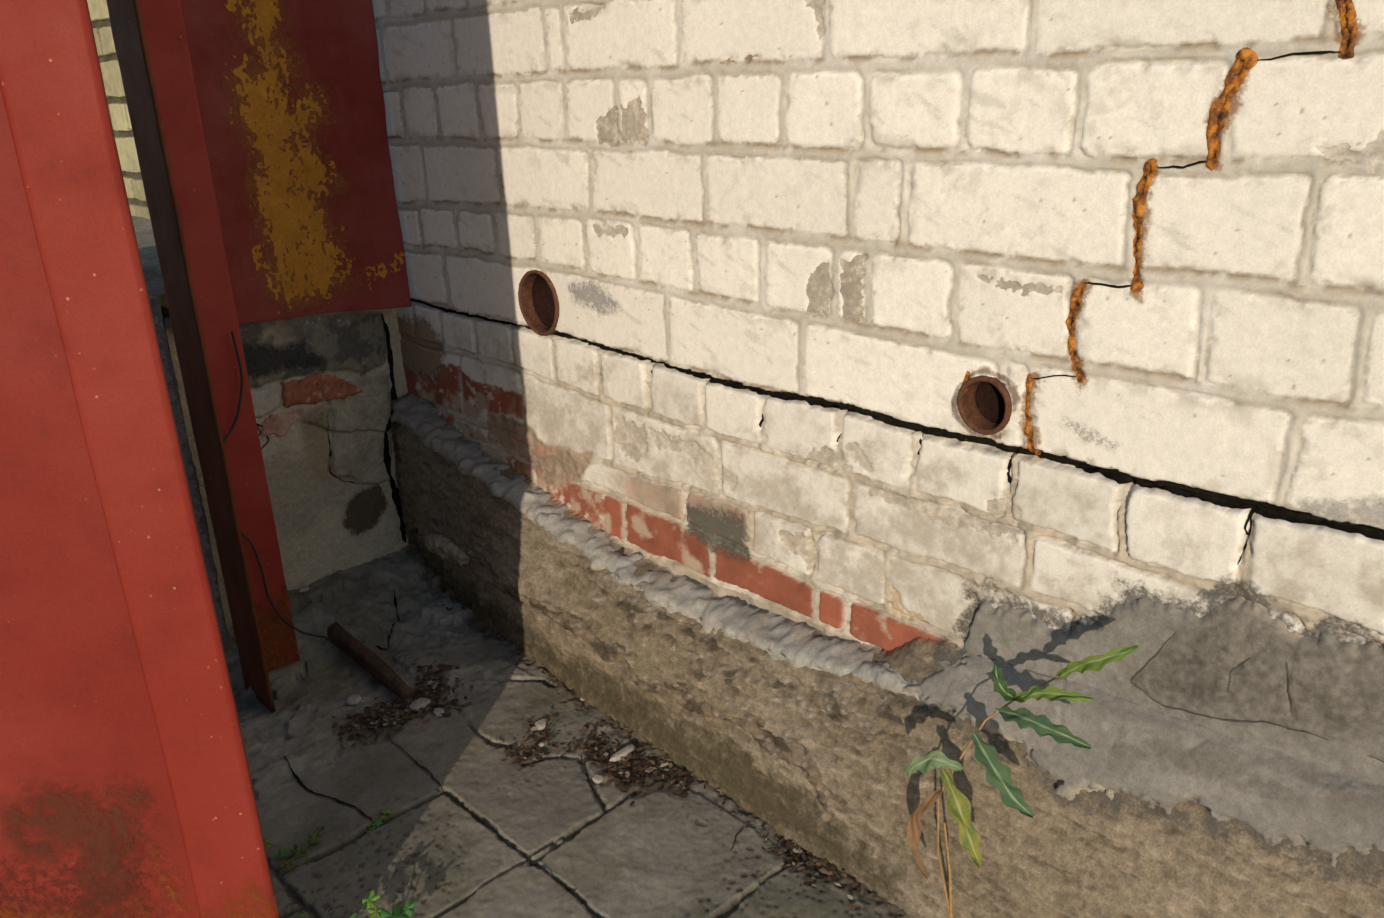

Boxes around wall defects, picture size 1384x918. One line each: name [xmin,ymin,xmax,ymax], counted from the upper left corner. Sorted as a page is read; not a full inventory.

crack [327,0,1384,565]
spalling [614,415,738,492]
water stain [343,485,387,535]
spalling [806,442,1021,544]
crack [363,591,400,650]
spalling [888,585,929,624]